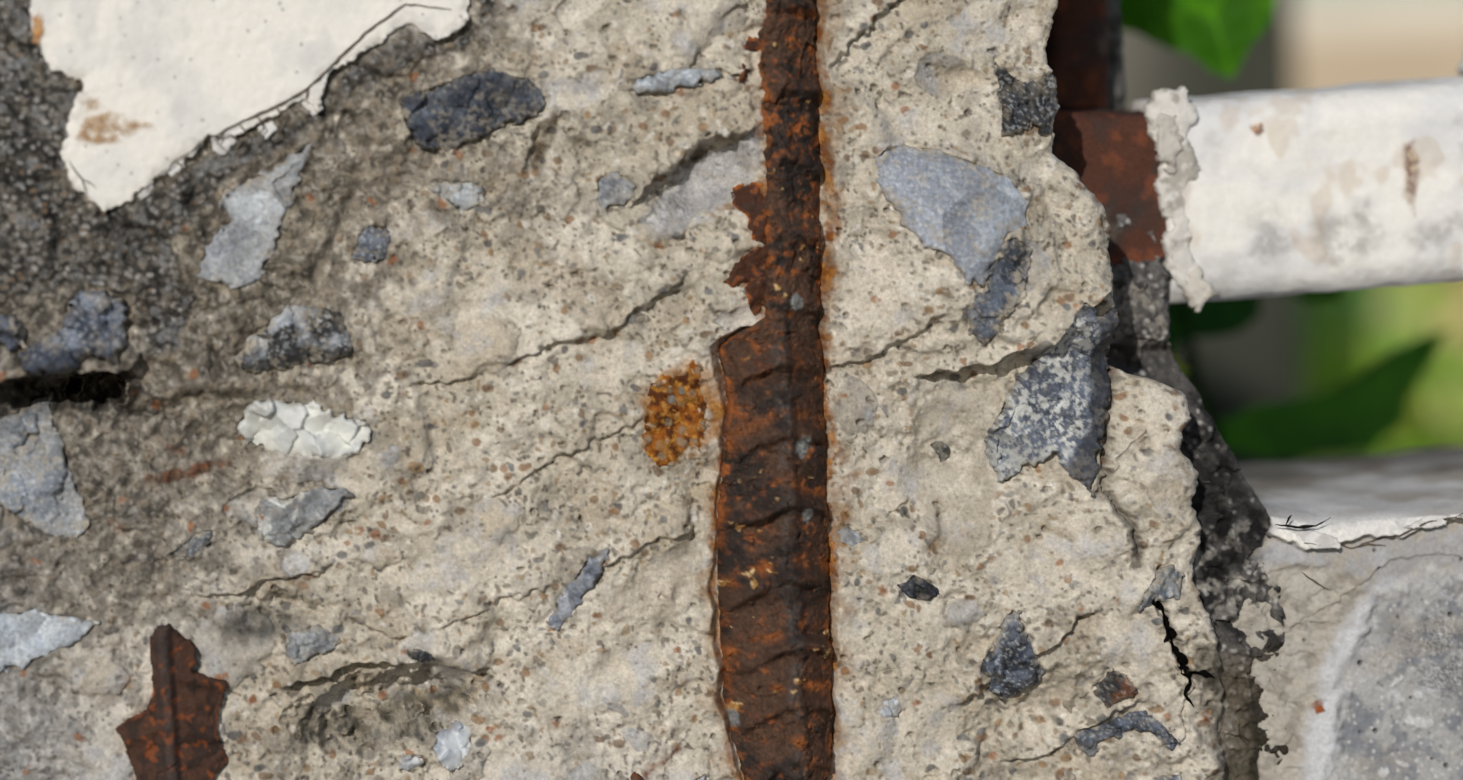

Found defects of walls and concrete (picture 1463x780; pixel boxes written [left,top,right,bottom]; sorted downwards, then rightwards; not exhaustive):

corrosion [1045,0,1109,110]
flaking render [0,0,329,353]
corrosion [819,90,833,191]
corrosion [819,225,836,296]
peeling [1143,86,1220,312]
corrosion [642,359,721,467]
spalling [605,0,834,780]
spalling [911,380,1000,562]
peeling [1403,514,1448,529]
spalling [115,623,228,780]
crack [1151,599,1215,707]
spalling [1353,602,1463,780]